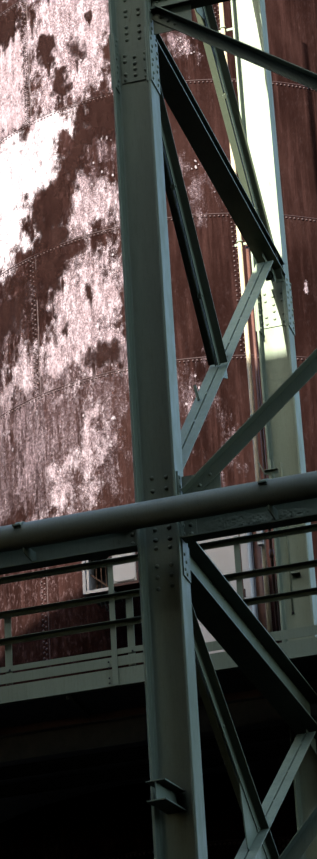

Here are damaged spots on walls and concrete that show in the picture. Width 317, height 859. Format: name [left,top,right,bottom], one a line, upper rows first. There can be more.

rust [0,7,87,106]
peeling [0,0,111,281]
rust [0,91,115,377]
rust [85,338,123,377]